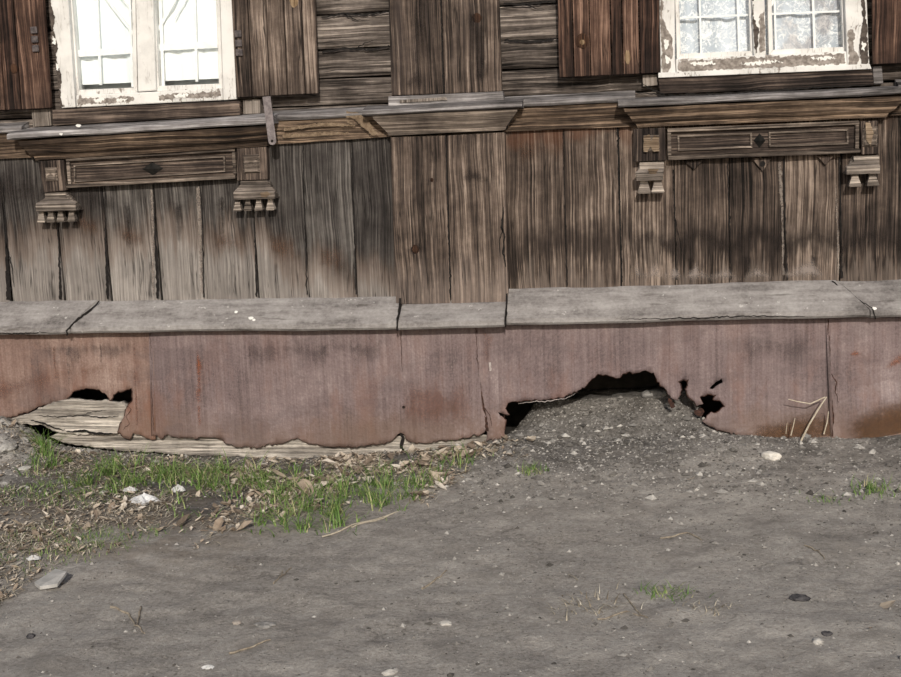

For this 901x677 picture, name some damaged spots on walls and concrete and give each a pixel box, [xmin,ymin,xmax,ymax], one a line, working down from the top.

peeling [660,0,869,72]
crack [3,179,109,336]
crack [832,157,876,319]
crack [475,328,492,431]